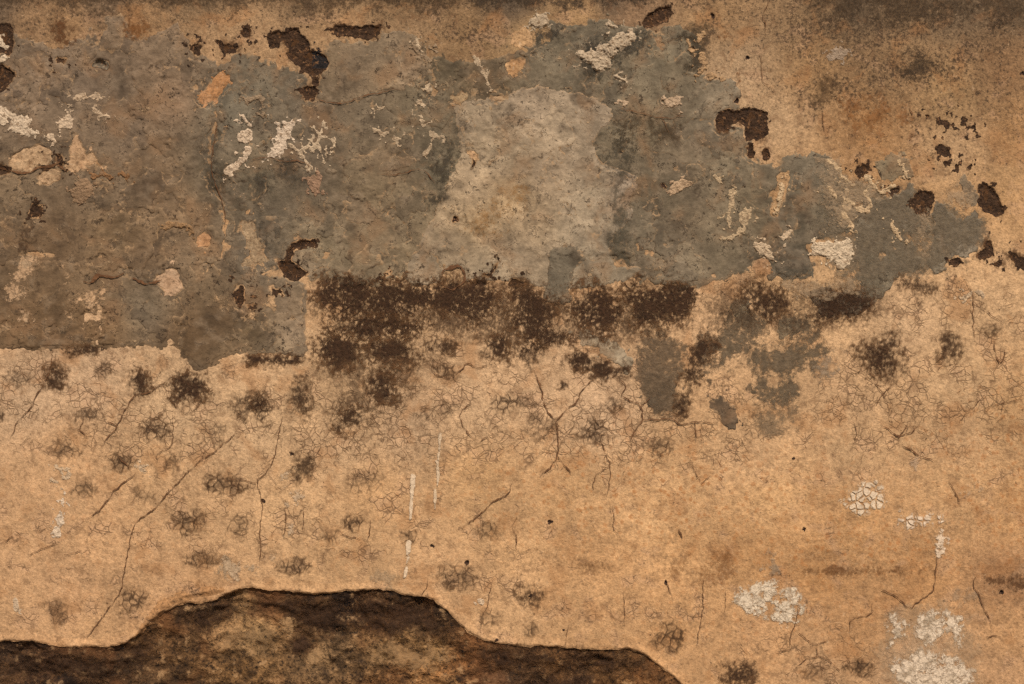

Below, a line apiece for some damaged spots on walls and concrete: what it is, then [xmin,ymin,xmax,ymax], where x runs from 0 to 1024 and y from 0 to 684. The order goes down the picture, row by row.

peeling [0,23,135,326]
peeling [158,21,422,359]
spalling [917,104,1024,272]
crack [70,382,235,637]
flaking render [0,576,693,684]
crack [230,358,500,563]
water stain [242,270,698,439]
crack [526,373,743,494]
water stain [672,334,722,421]
water stain [733,558,805,628]
crack [809,290,1019,474]
water stain [886,609,977,684]